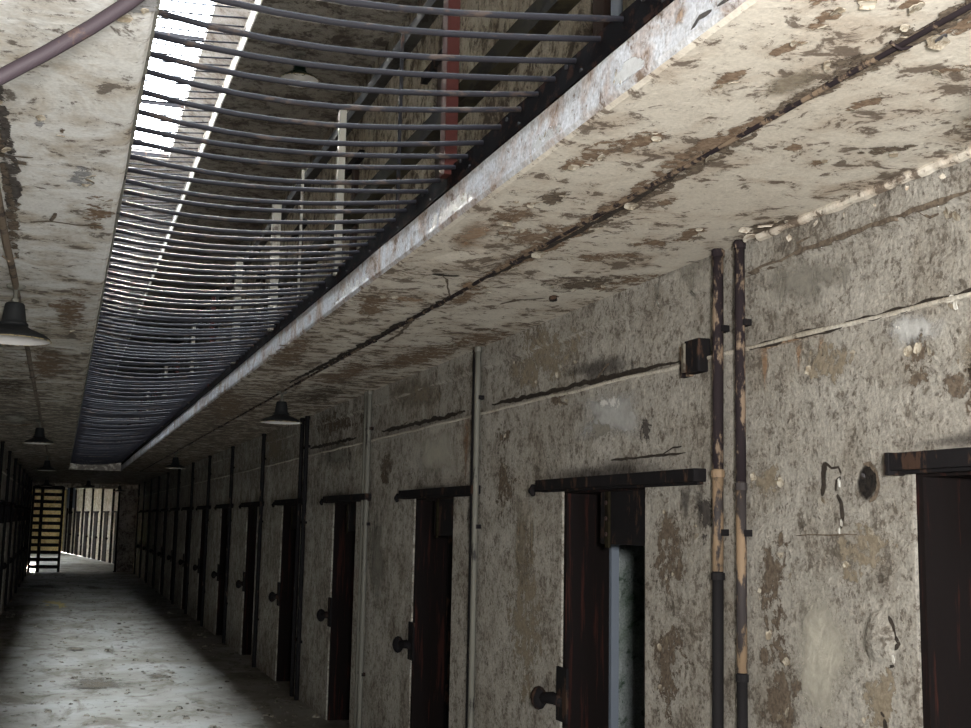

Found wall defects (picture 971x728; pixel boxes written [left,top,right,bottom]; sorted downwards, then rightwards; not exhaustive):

crack [691,0,729,30]
spalling [0,86,27,259]
peeling [67,166,115,230]
peeling [427,191,473,233]
spalling [444,0,971,307]
crack [746,190,971,277]
peeling [48,288,91,334]
peeling [334,269,423,316]
crack [287,275,483,384]
crack [749,288,971,350]
crack [492,361,679,405]
crack [821,462,844,534]